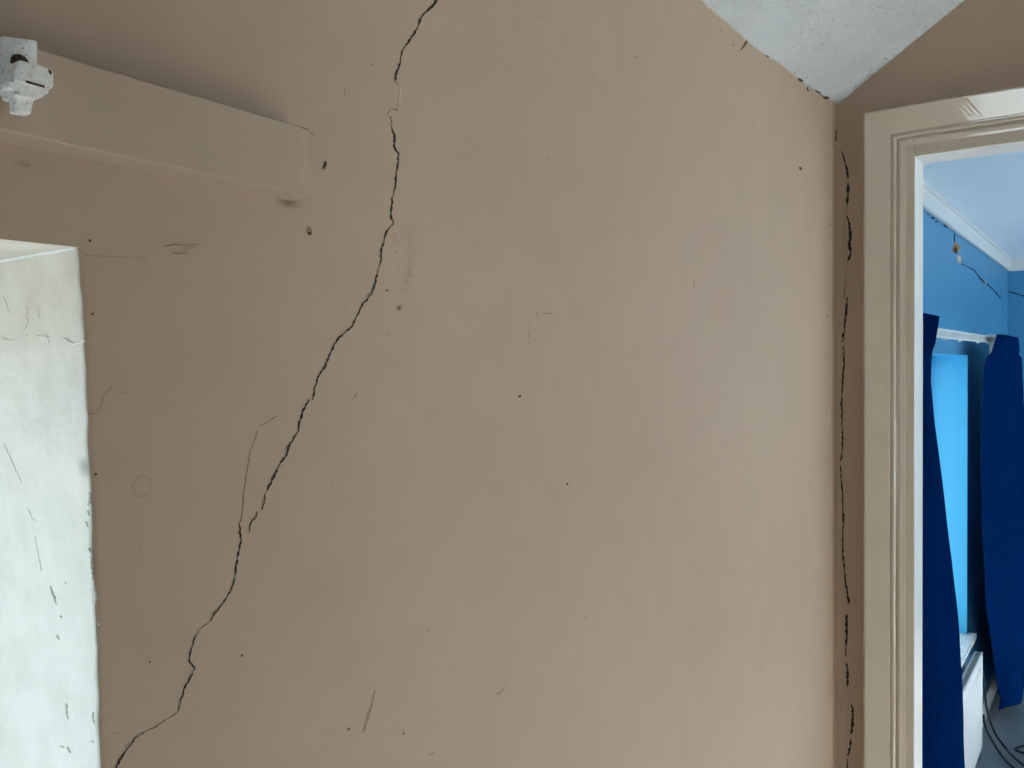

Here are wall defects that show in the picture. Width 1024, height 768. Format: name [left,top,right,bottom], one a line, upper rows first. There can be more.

crack [114,0,438,768]
crack [834,128,855,768]
crack [952,233,1024,299]